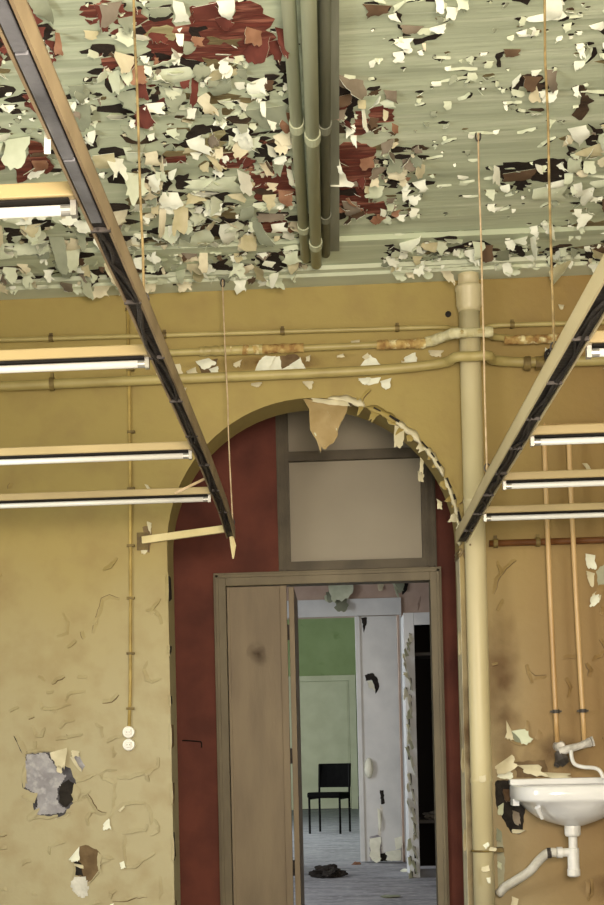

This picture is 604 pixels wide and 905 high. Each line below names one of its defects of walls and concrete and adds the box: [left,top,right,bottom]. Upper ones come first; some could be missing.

peeling [28,0,63,63]
peeling [0,37,63,183]
peeling [66,0,311,294]
peeling [330,0,604,286]
peeling [0,209,120,300]
peeling [255,354,310,371]
peeling [303,381,461,530]
peeling [585,554,604,615]
spalling [14,734,91,822]
spalling [69,845,112,898]
peeling [455,542,469,905]
peeling [479,720,571,887]